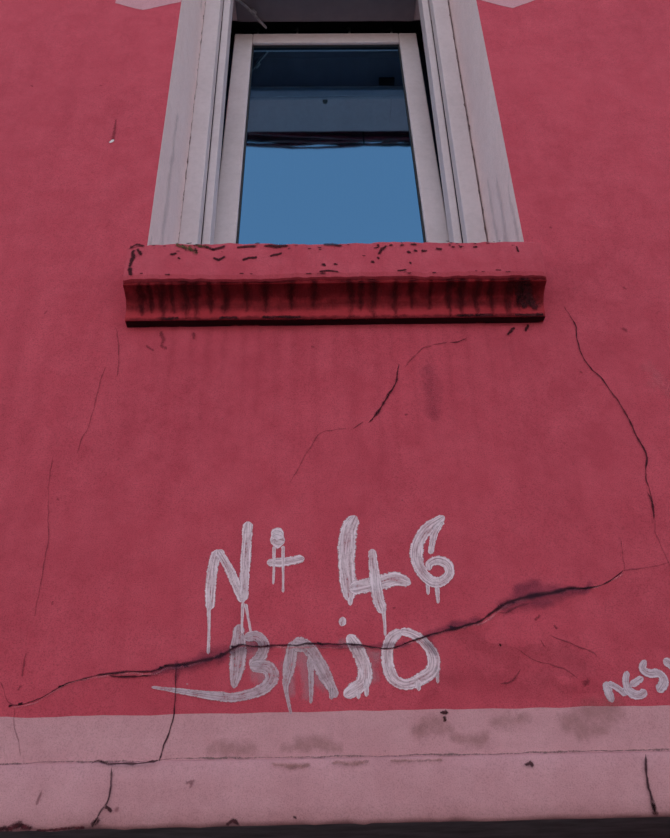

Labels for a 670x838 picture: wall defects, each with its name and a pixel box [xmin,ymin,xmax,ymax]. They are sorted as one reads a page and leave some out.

peeling [237,243,298,261]
peeling [362,241,477,273]
crack [356,366,399,427]
crack [564,307,655,517]
crack [0,568,668,827]